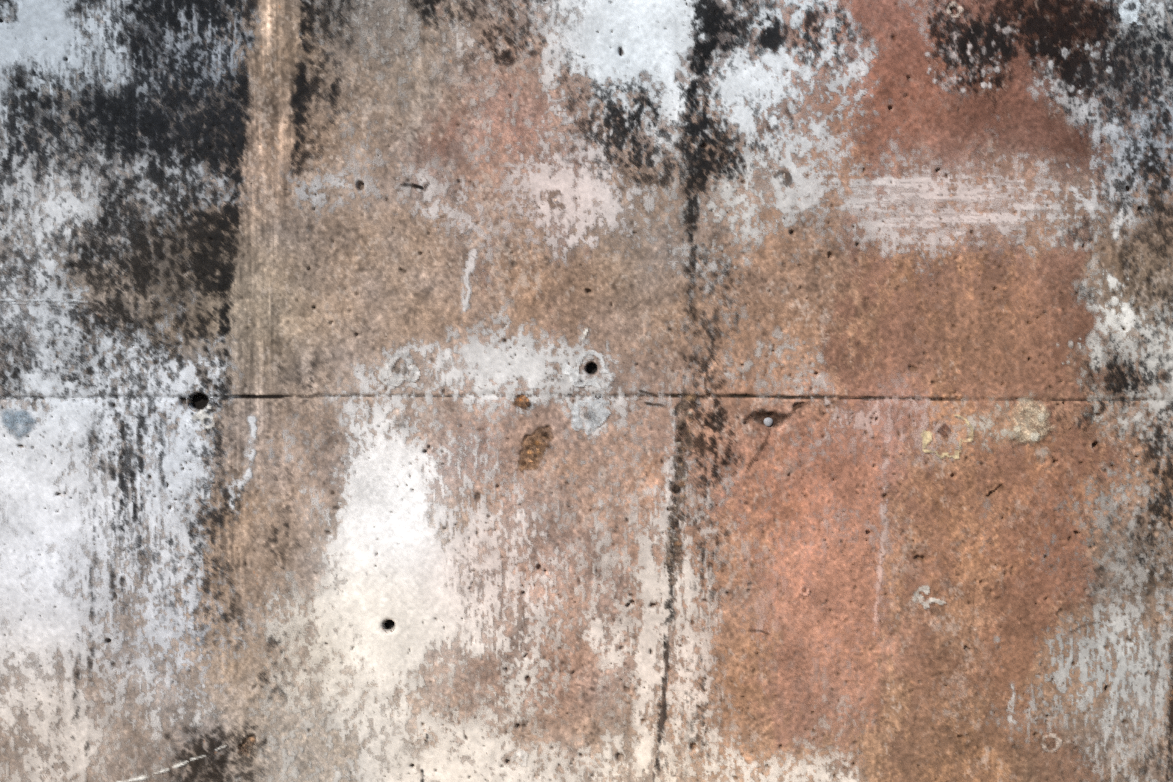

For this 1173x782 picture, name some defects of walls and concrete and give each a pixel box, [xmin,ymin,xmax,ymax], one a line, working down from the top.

damp [0,0,257,644]
damp [409,0,558,65]
damp [657,677,667,742]
damp [557,0,854,659]
corrosion [715,0,1109,782]
damp [928,0,1173,428]